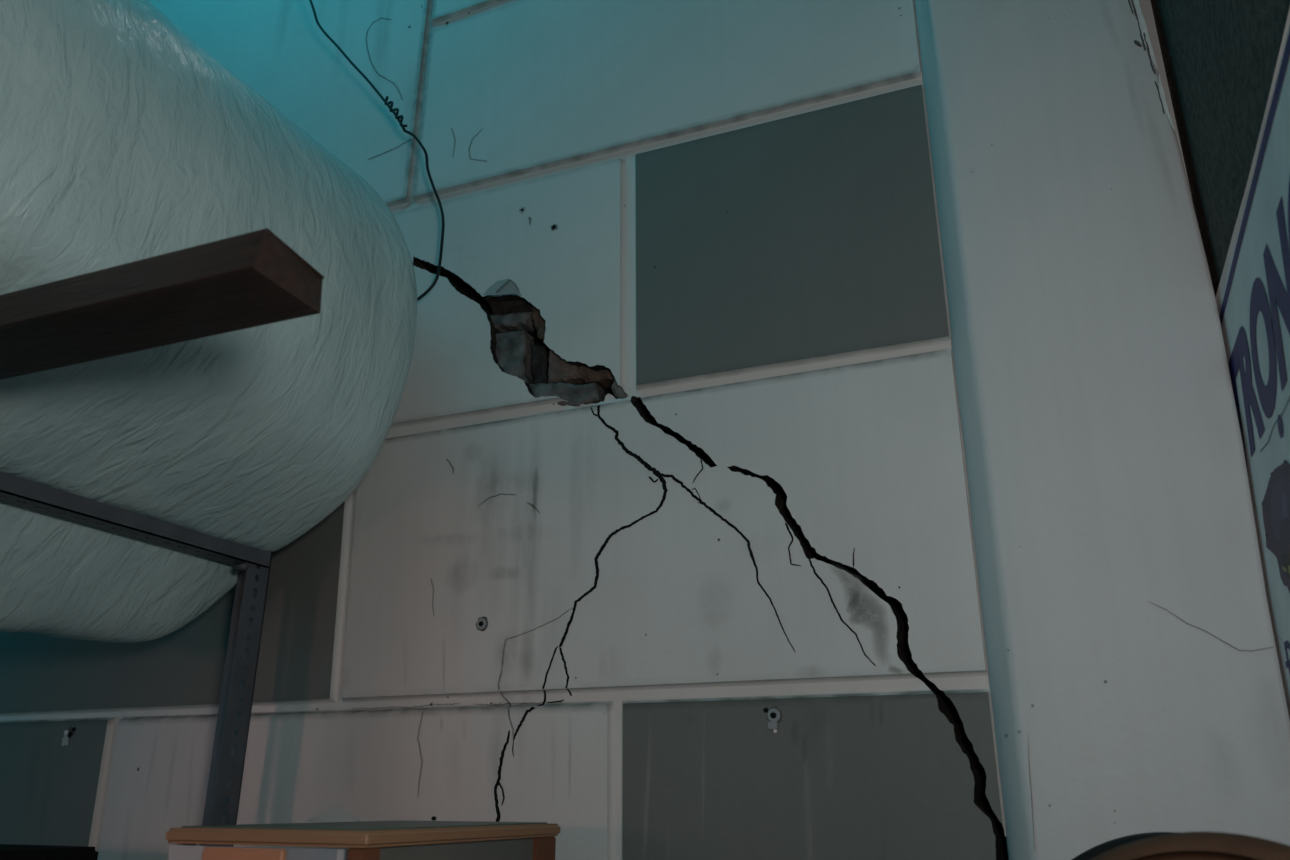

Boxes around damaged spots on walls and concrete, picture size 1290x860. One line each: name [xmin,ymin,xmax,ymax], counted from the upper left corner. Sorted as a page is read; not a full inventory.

spalling [413,256,629,407]
crack [494,396,1008,860]